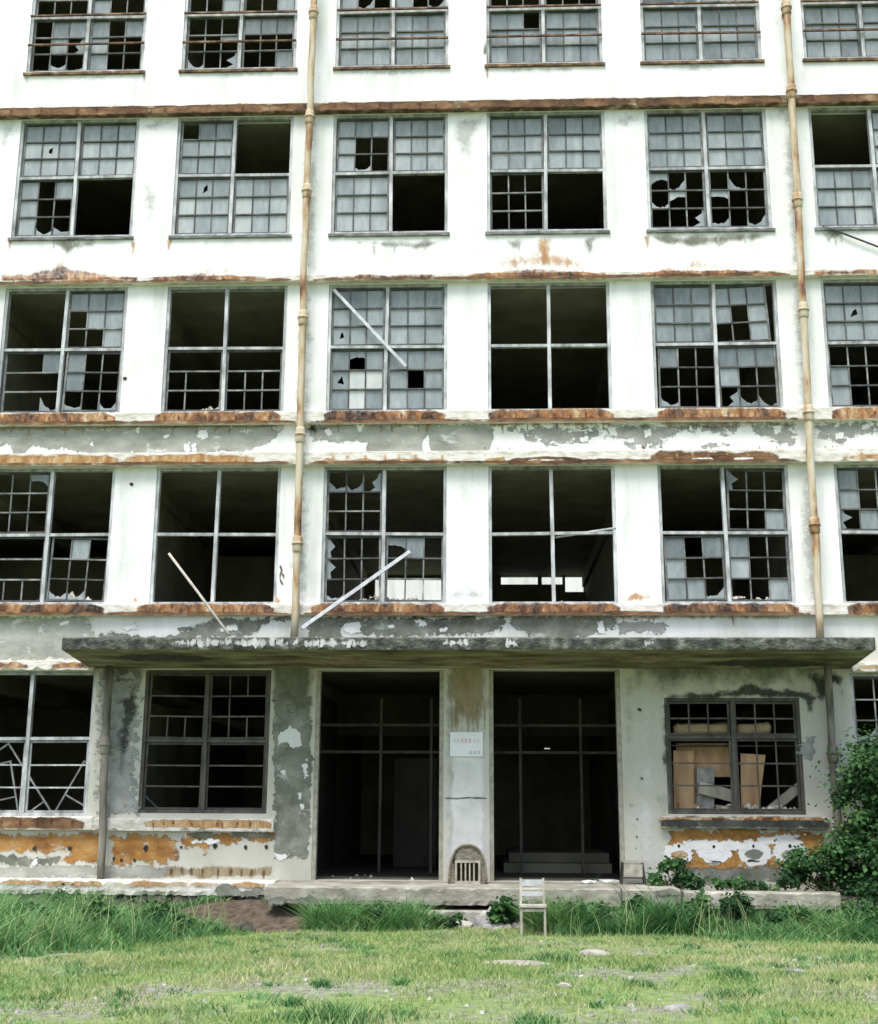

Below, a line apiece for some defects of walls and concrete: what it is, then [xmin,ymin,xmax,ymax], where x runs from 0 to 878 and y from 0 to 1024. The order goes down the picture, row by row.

rust [0,103,304,116]
rust [0,266,291,285]
rust [313,240,791,281]
peeling [0,425,284,453]
rust [0,411,295,434]
peeling [309,422,771,465]
peeling [0,616,669,661]
water stain [103,654,210,753]
water stain [449,662,555,736]
water stain [612,655,841,764]
peeling [0,695,314,866]
spalling [668,828,826,885]